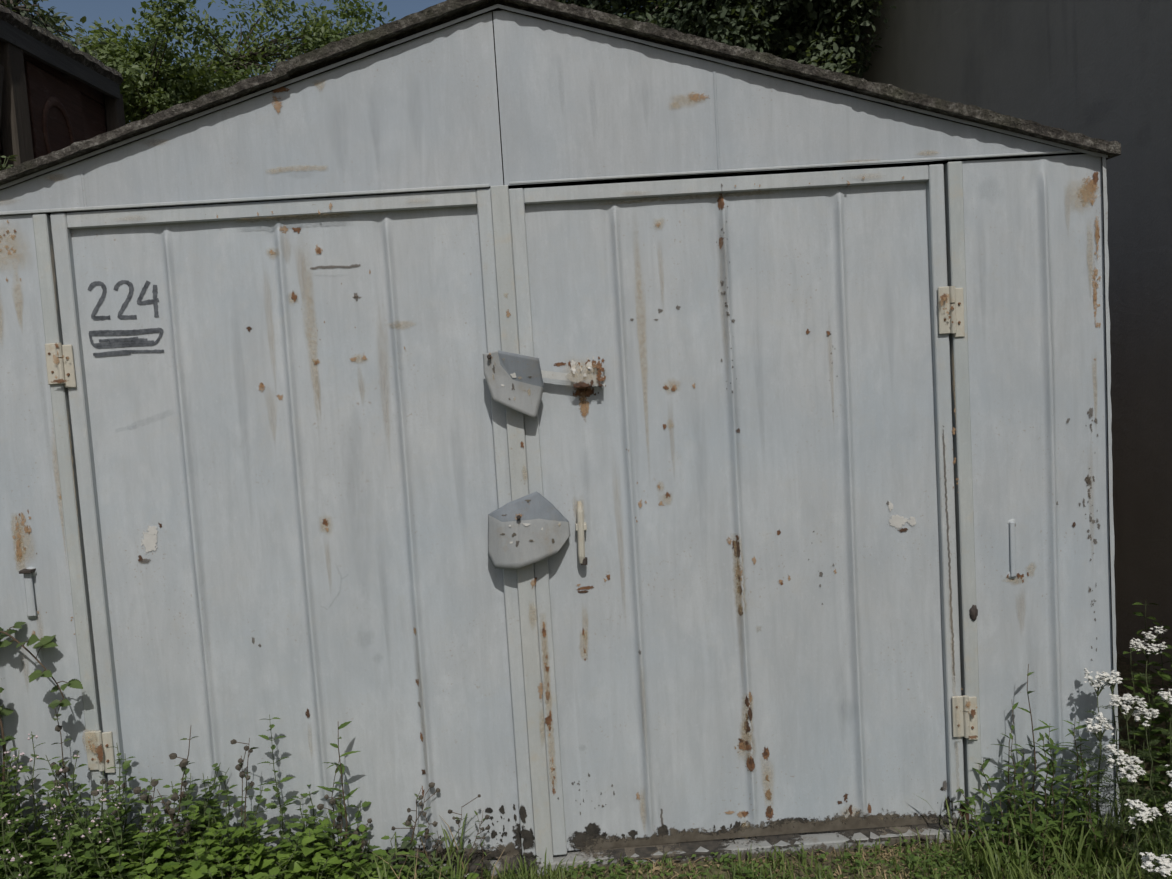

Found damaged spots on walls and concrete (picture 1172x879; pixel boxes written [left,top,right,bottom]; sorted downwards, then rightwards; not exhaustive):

corrosion [1078,171,1101,327]
corrosion [554,356,606,416]
corrosion [13,510,37,561]
peeling [138,522,162,563]
corrosion [728,535,756,616]
corrosion [538,655,552,736]
corrosion [735,692,774,820]